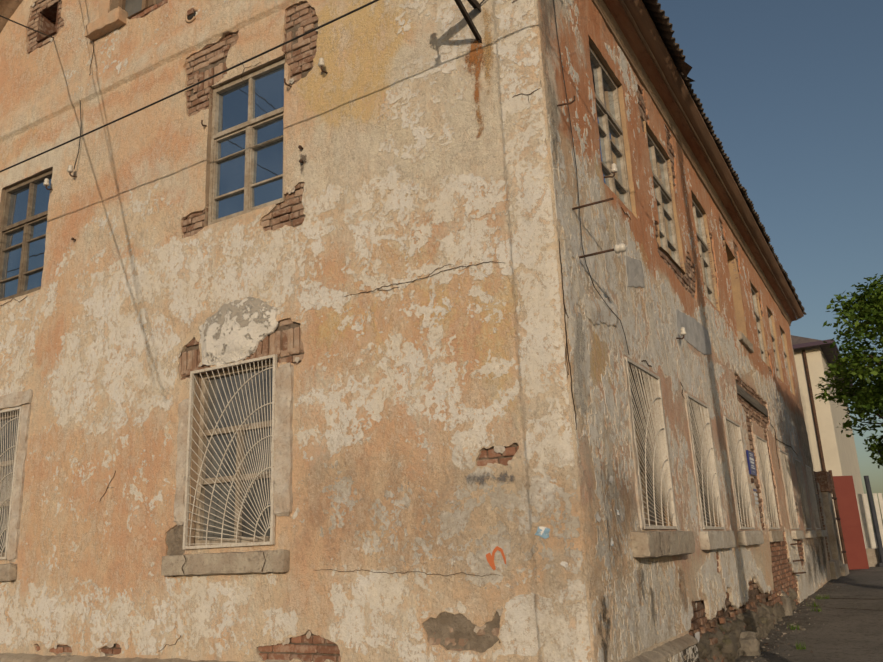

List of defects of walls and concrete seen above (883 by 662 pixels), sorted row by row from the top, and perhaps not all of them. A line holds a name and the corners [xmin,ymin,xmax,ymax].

spalling [27,0,136,101]
spalling [185,33,239,117]
spalling [282,2,319,85]
peeling [377,0,485,167]
corrosion [465,9,491,138]
crack [344,261,503,297]
spalling [646,177,705,301]
crack [559,240,577,430]
peeling [123,444,185,555]
peeling [713,442,738,531]
peeling [0,573,258,658]
crack [315,569,500,577]